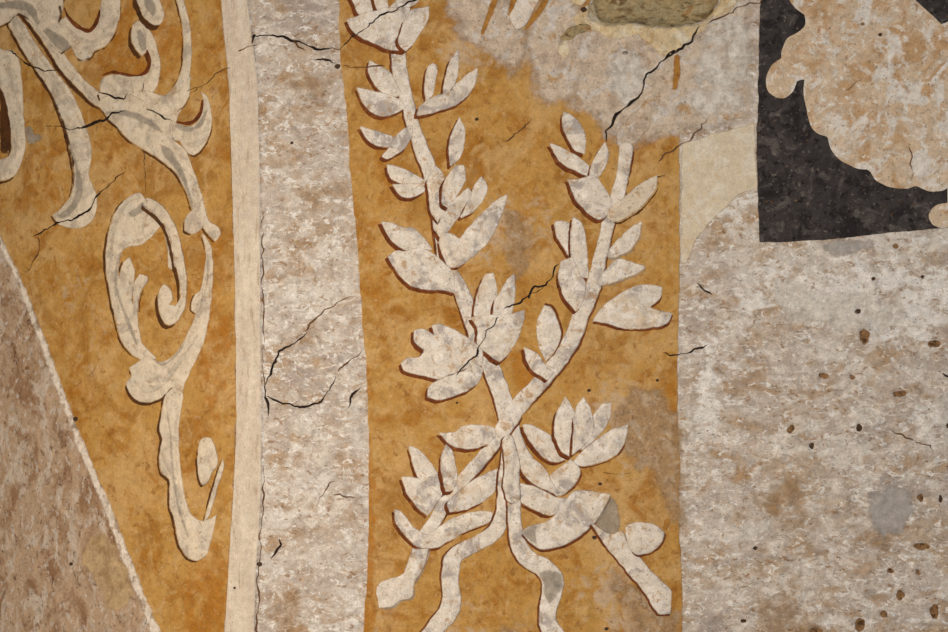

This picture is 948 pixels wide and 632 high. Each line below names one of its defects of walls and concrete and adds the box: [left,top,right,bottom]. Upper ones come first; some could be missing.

crack [11,50,56,72]
crack [43,0,417,130]
peeling [446,0,756,147]
crack [605,0,762,141]
crack [27,151,147,271]
crack [261,207,362,415]
crack [457,264,558,374]